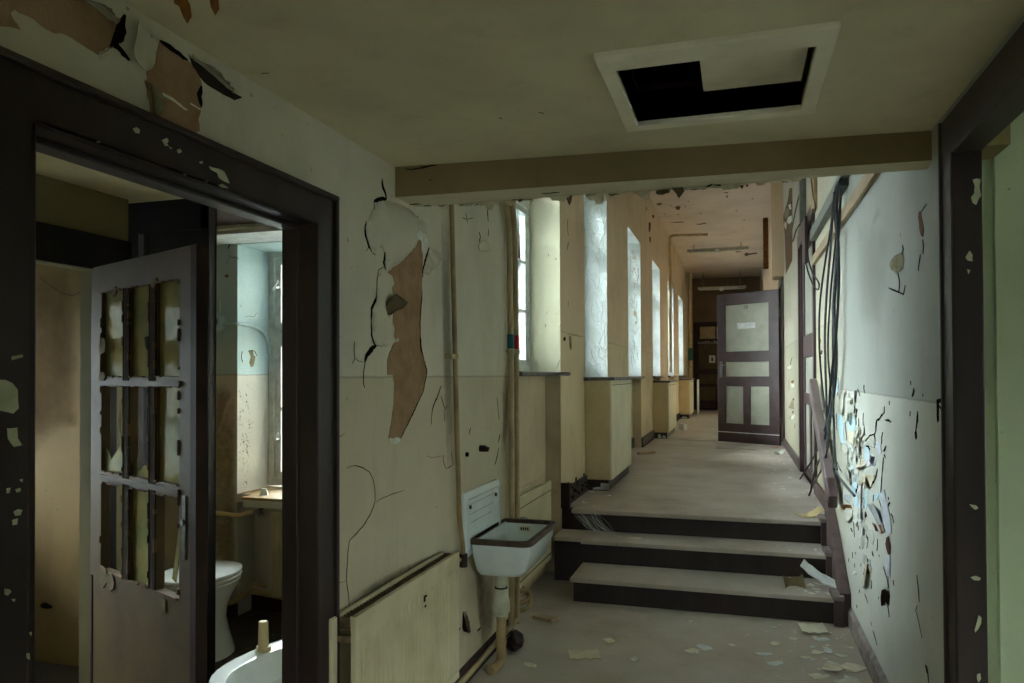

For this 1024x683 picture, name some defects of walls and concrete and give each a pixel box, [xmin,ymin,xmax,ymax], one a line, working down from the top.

peeling [0,0,242,133]
spalling [0,380,19,413]
spalling [7,428,22,447]
spalling [199,161,229,189]
crack [340,465,404,606]
crack [352,179,431,388]
crack [401,248,447,437]
peeling [386,179,801,444]
peeling [836,380,894,614]
peeling [889,245,906,295]
peeling [918,204,927,271]
spalling [971,179,981,205]